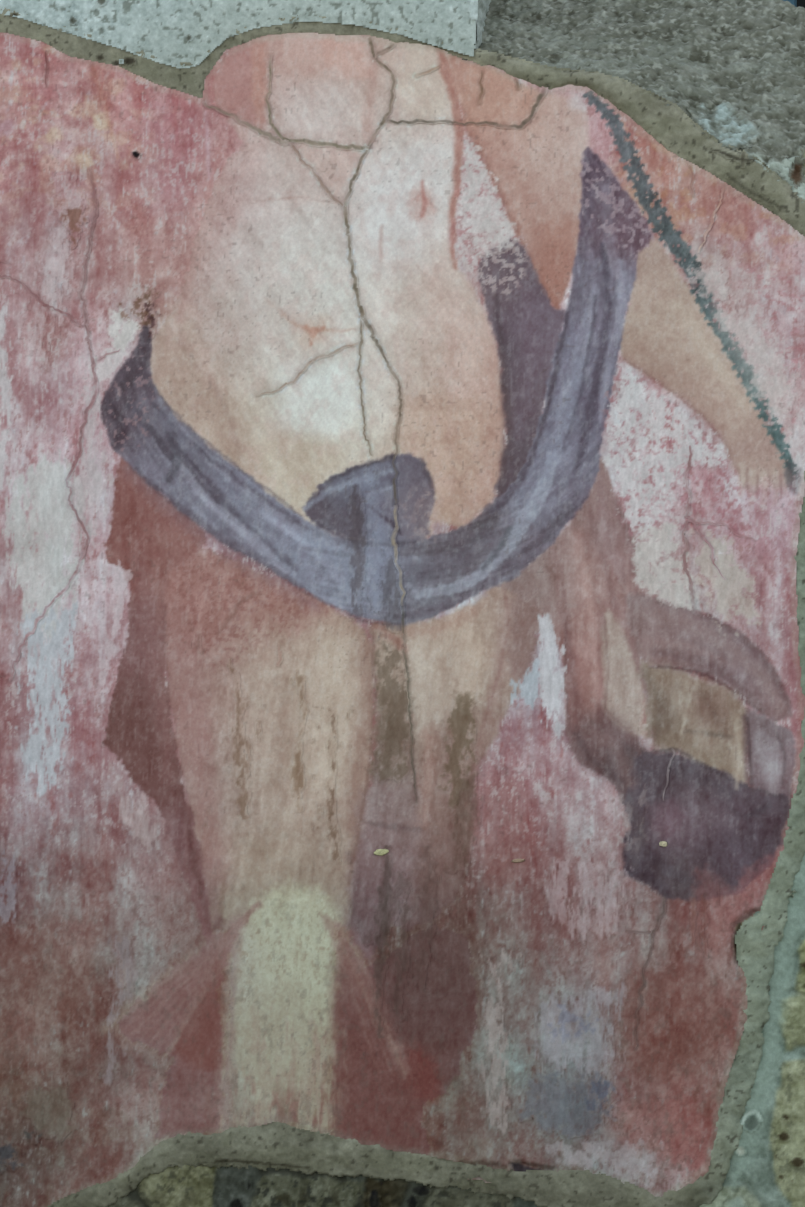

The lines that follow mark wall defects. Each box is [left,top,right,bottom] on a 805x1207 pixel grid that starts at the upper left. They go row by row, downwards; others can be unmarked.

crack [42,50,50,88]
crack [0,168,121,682]
crack [203,37,548,803]